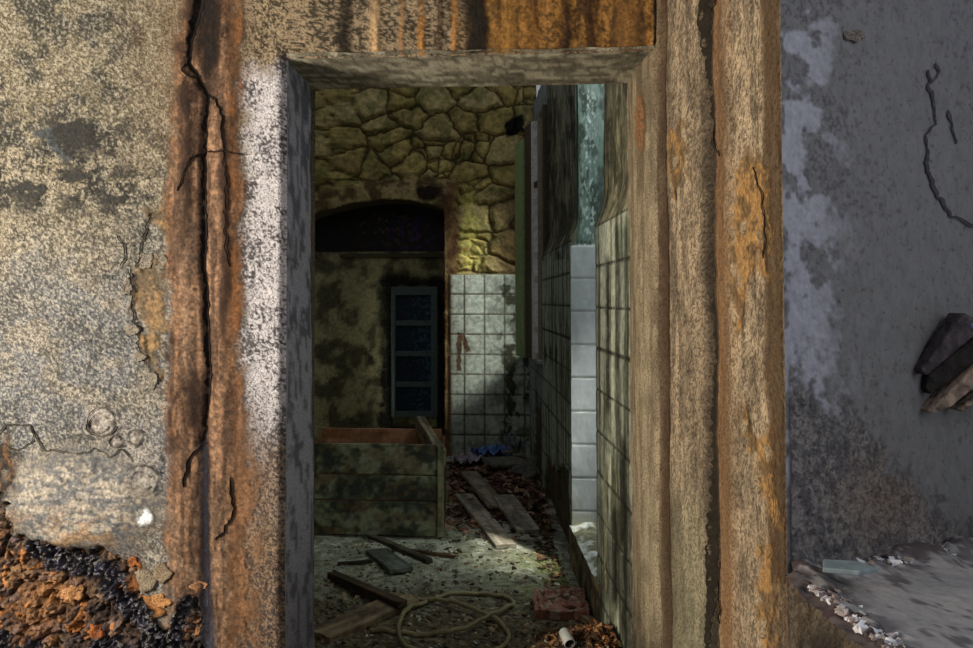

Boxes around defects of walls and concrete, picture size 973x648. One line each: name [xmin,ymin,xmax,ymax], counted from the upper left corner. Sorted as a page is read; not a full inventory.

corrosion [483,0,667,50]
leakage [0,164,46,205]
leakage [34,115,136,209]
crack [177,0,243,487]
corrosion [661,61,670,383]
crack [752,167,767,258]
corrosion [163,0,257,648]
crack [697,0,721,648]
corrosion [662,398,670,578]
flaking render [0,494,143,648]
flaking render [71,547,173,635]
flaking render [181,581,208,648]